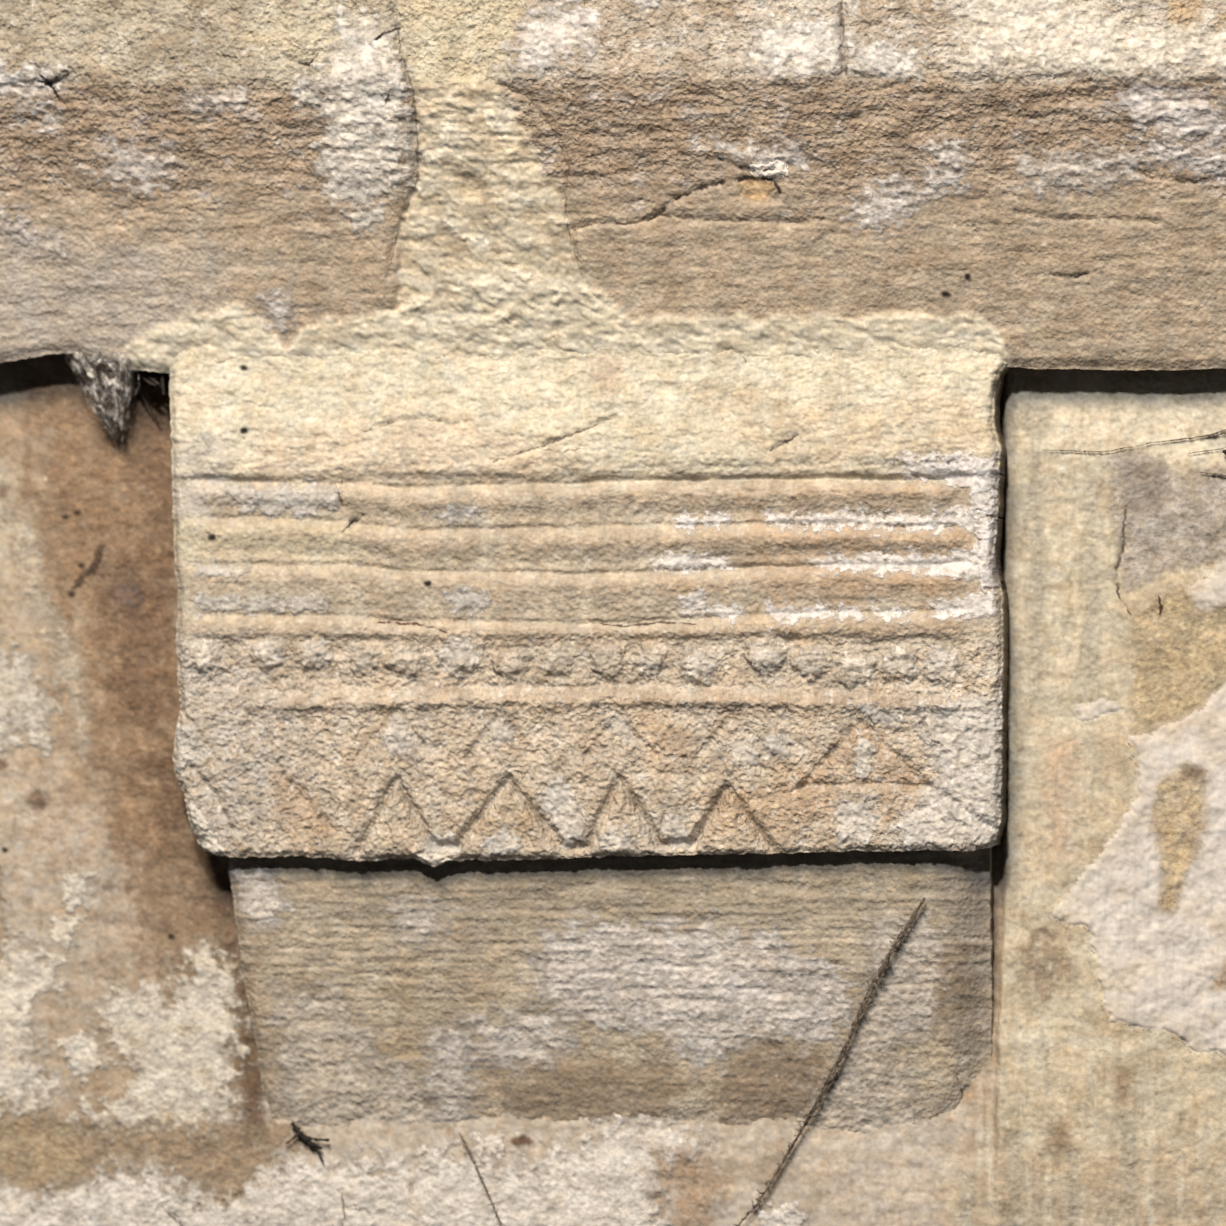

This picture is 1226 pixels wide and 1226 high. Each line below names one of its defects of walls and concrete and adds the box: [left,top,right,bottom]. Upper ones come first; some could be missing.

crack [520,93,797,295]
crack [1114,508,1131,614]
leakage [0,363,343,1206]